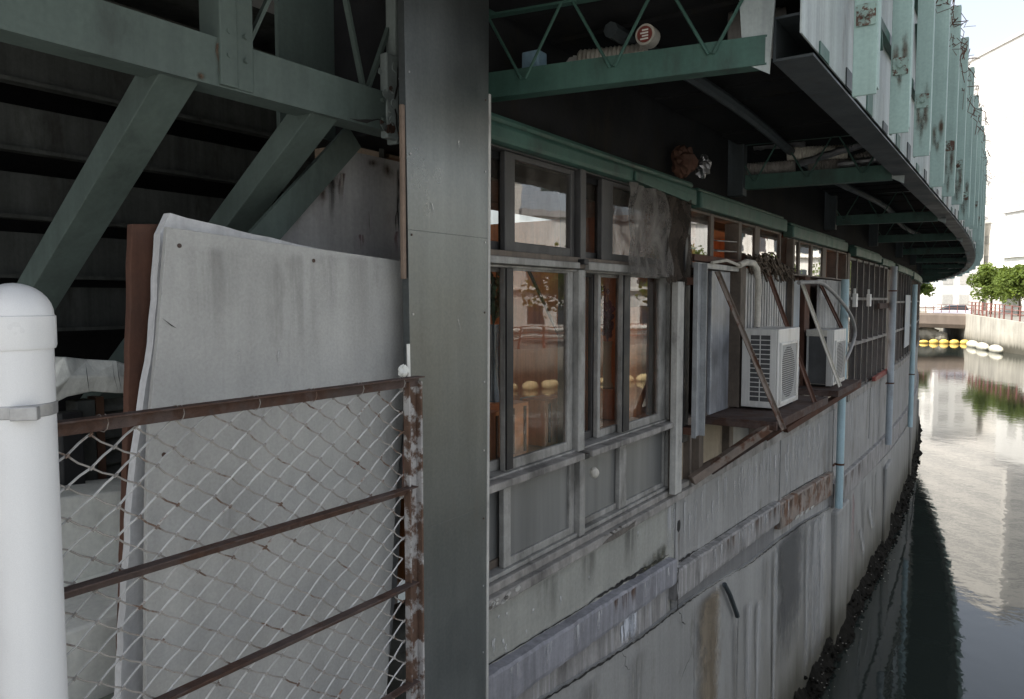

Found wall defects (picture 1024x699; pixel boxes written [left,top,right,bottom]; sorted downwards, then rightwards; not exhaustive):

leakage [701,593,719,699]